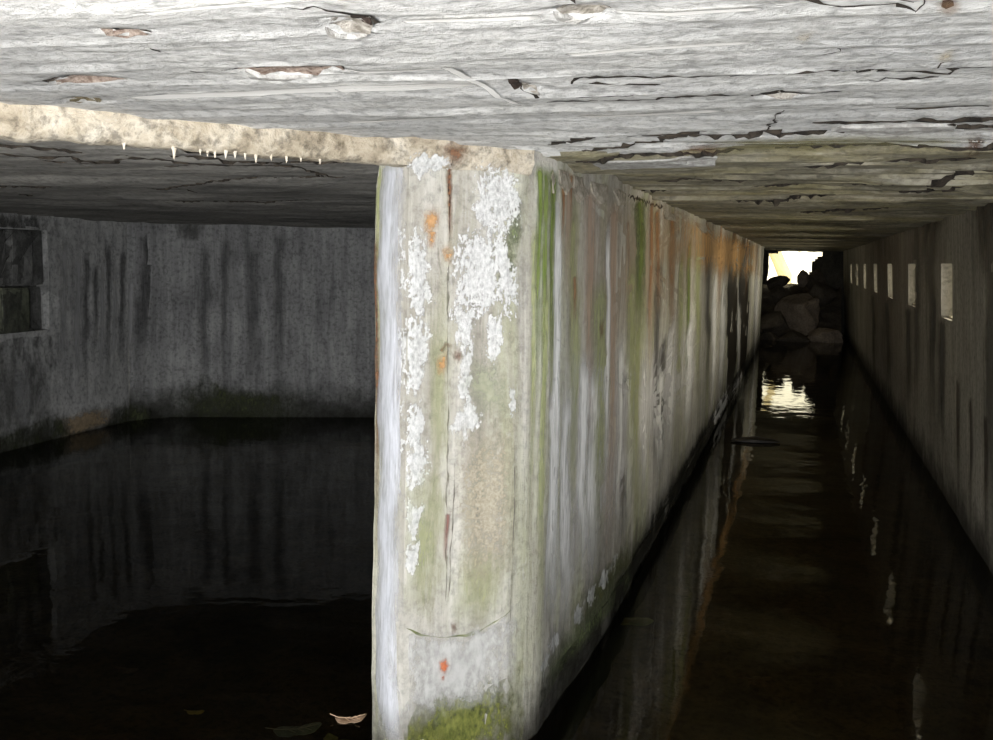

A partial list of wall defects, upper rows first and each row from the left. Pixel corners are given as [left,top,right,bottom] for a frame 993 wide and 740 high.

spalling [291,6,380,40]
spalling [553,0,611,24]
crack [806,0,925,12]
spalling [42,75,124,84]
spalling [234,66,345,81]
spalling [508,79,540,99]
crack [547,47,992,103]
crack [0,153,343,204]
leakage [61,242,150,355]
rust [573,198,757,401]
leakage [188,383,289,420]
leakage [531,169,759,705]